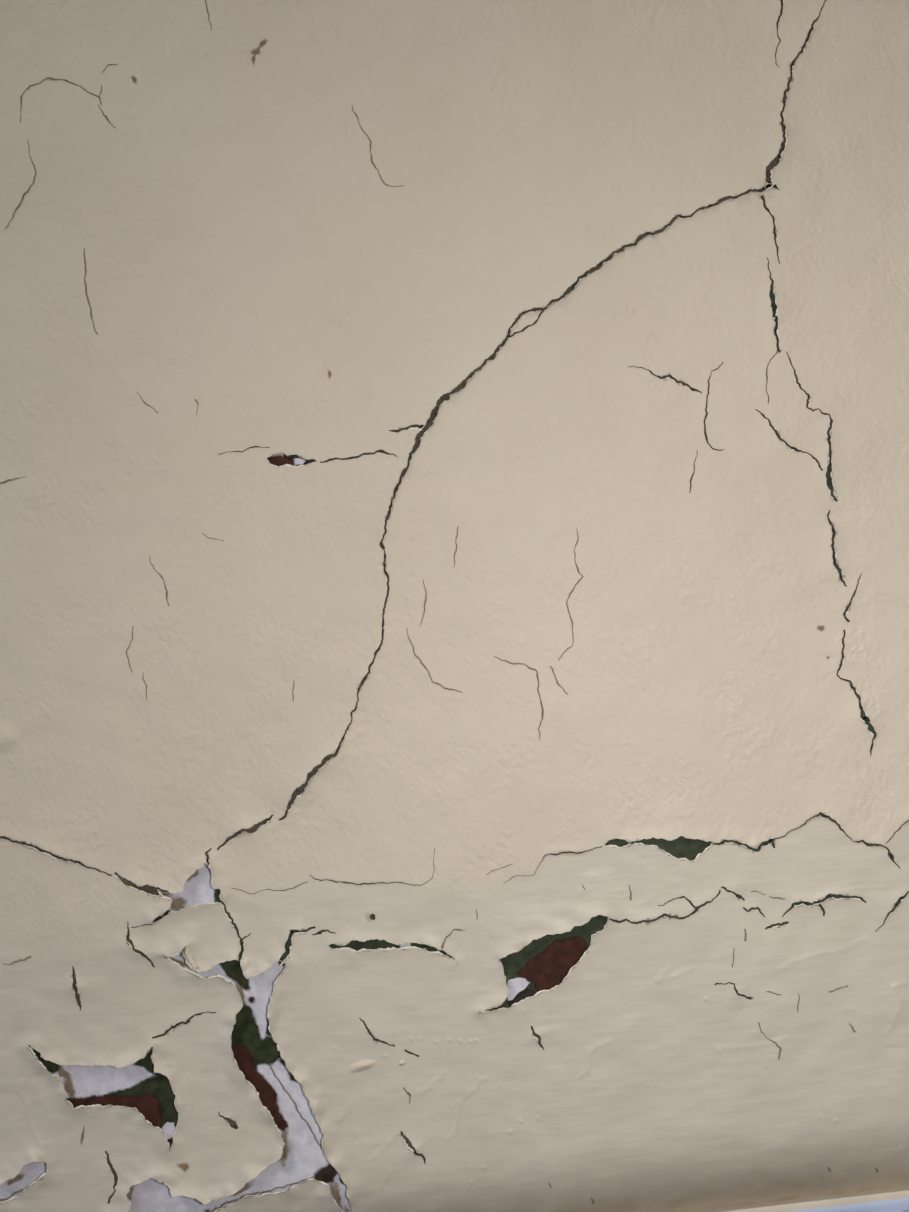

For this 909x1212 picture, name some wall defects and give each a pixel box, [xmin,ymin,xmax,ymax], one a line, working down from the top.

crack [5,64,118,229]
crack [84,247,98,335]
peeling [267,452,319,467]
crack [204,0,877,863]
crack [149,556,169,606]
peeling [151,862,222,925]
crack [221,848,435,966]
crack [441,910,478,949]
peeling [481,915,609,1013]
peeling [605,836,713,861]
peeling [27,1044,178,1153]
peeling [126,947,352,1212]